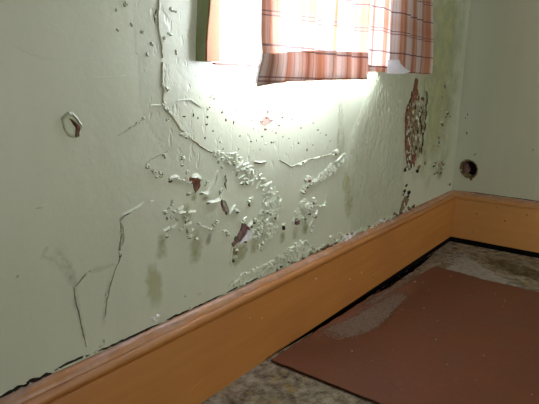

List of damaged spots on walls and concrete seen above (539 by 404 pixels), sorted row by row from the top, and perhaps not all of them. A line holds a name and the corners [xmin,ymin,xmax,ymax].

crack [105,200,154,315]
peeling [145,141,346,266]
flaking render [228,205,415,288]
spalling [459,154,478,181]